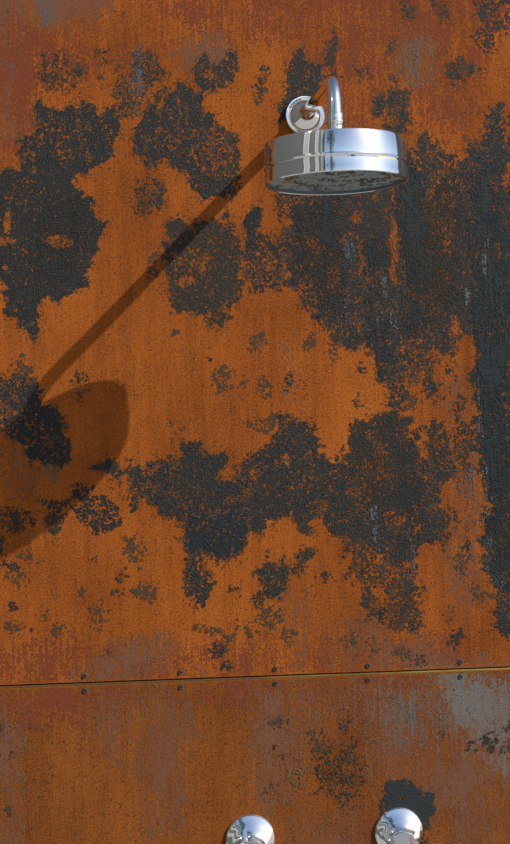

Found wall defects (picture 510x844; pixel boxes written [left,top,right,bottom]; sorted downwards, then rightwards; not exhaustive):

rust [388,223,402,266]
rust [450,315,463,338]